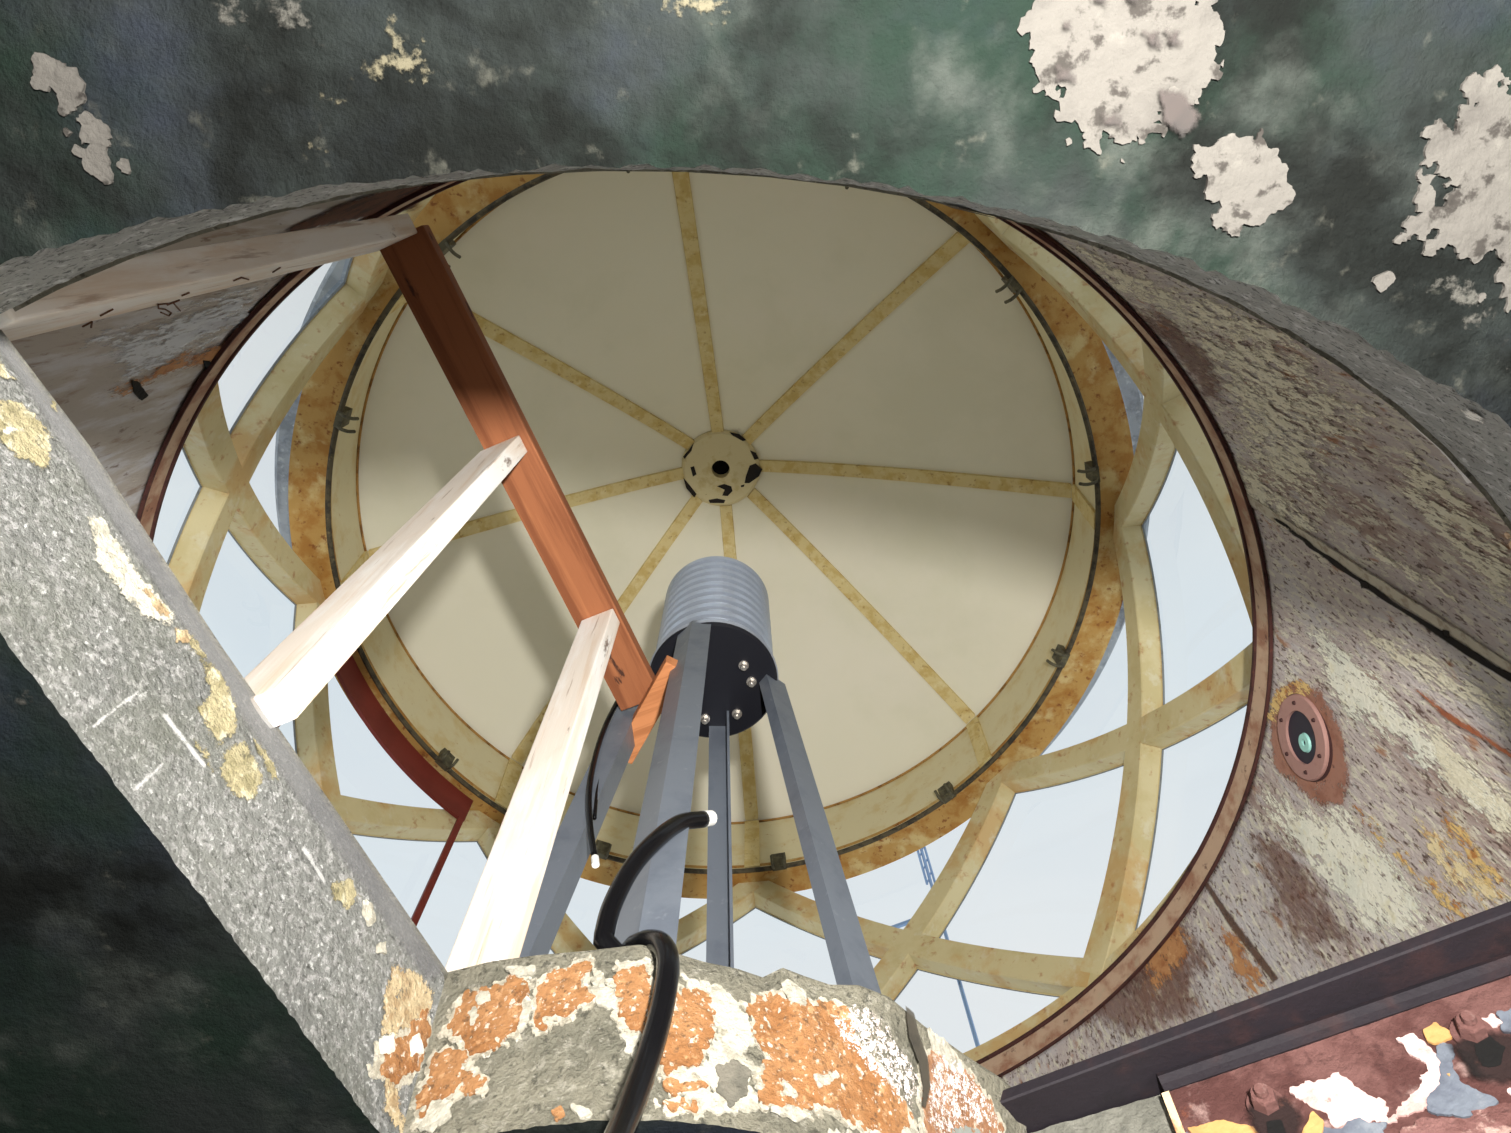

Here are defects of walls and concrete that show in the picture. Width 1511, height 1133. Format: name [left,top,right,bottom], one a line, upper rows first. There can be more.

peeling [30,52,132,185]
peeling [1016,0,1296,237]
peeling [1392,64,1511,323]
spalling [0,399,58,469]
spalling [87,515,279,801]
crack [1247,495,1511,682]
rust [1267,678,1511,922]
peeling [366,941,655,1133]
peeling [653,972,1006,1133]
peeling [1185,1120,1256,1133]
peeling [1289,1022,1511,1133]
peeling [1482,1009,1511,1034]